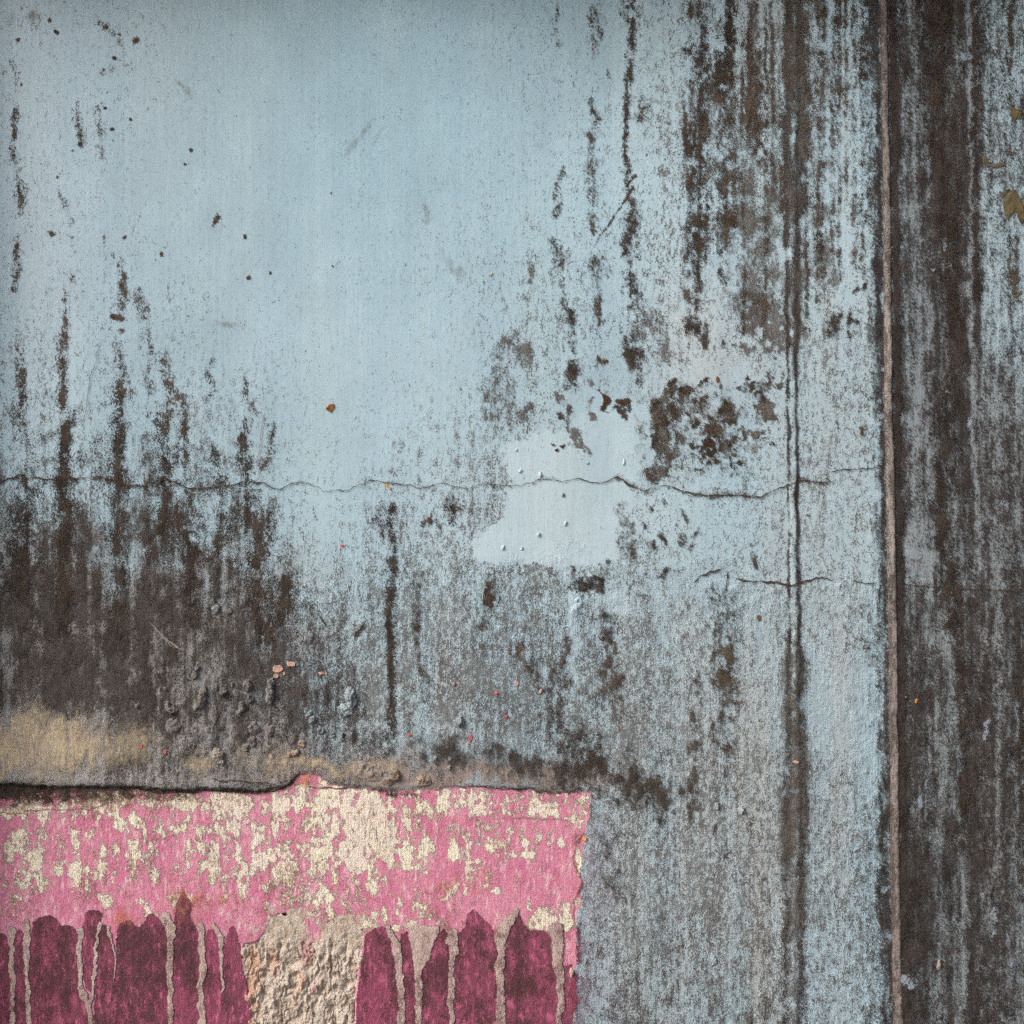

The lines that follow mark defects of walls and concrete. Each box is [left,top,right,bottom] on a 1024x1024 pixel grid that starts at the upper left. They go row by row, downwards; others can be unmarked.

water stain [97,20,140,76]
water stain [8,102,28,216]
water stain [71,92,114,160]
water stain [8,233,23,295]
crack [0,419,879,501]
water stain [0,252,474,791]
water stain [551,0,1024,1024]
water stain [477,580,497,652]
crack [695,568,876,591]
crack [905,584,1024,592]
water stain [514,637,573,728]
peeling [0,773,591,1024]